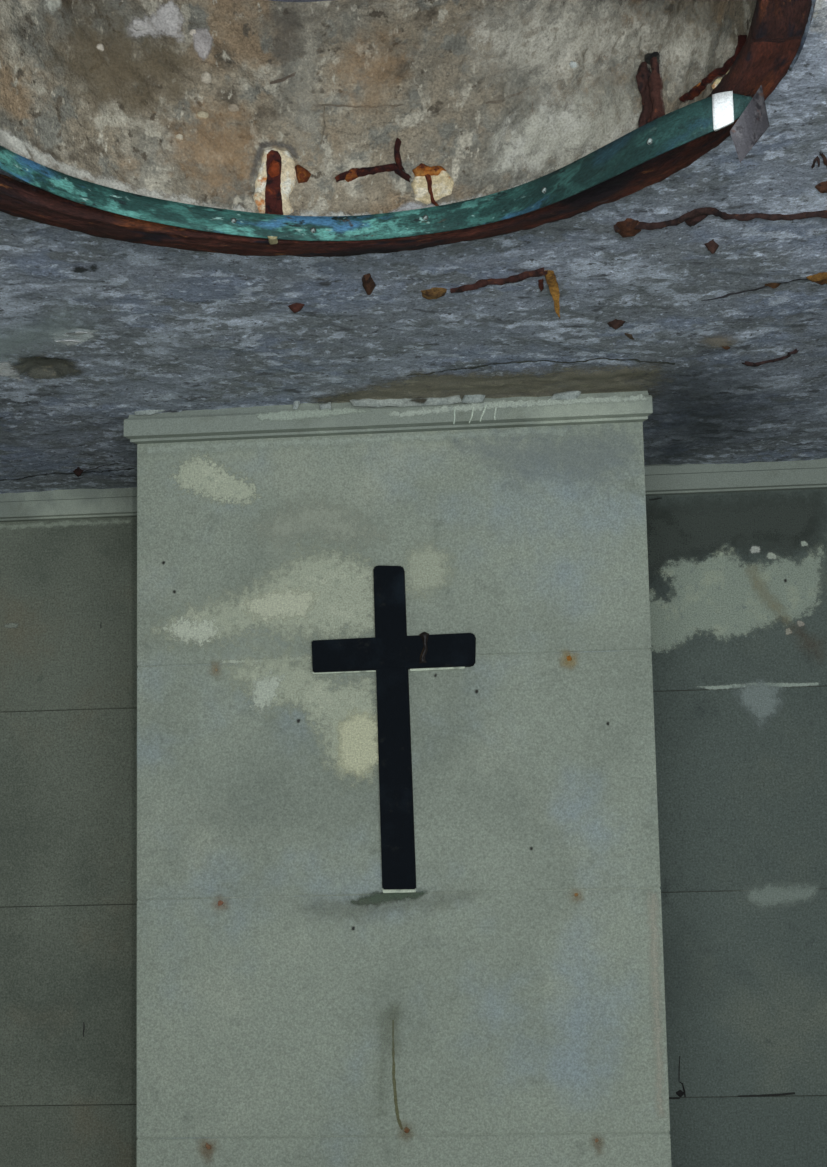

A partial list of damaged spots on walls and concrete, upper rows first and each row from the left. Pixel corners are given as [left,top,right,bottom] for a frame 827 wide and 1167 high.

peeling [45,0,61,10]
peeling [129,1,213,60]
peeling [468,0,747,173]
spalling [252,141,311,215]
spalling [335,138,454,213]
corrosion [815,181,827,193]
corrosion [704,239,719,254]
damp [646,498,819,574]